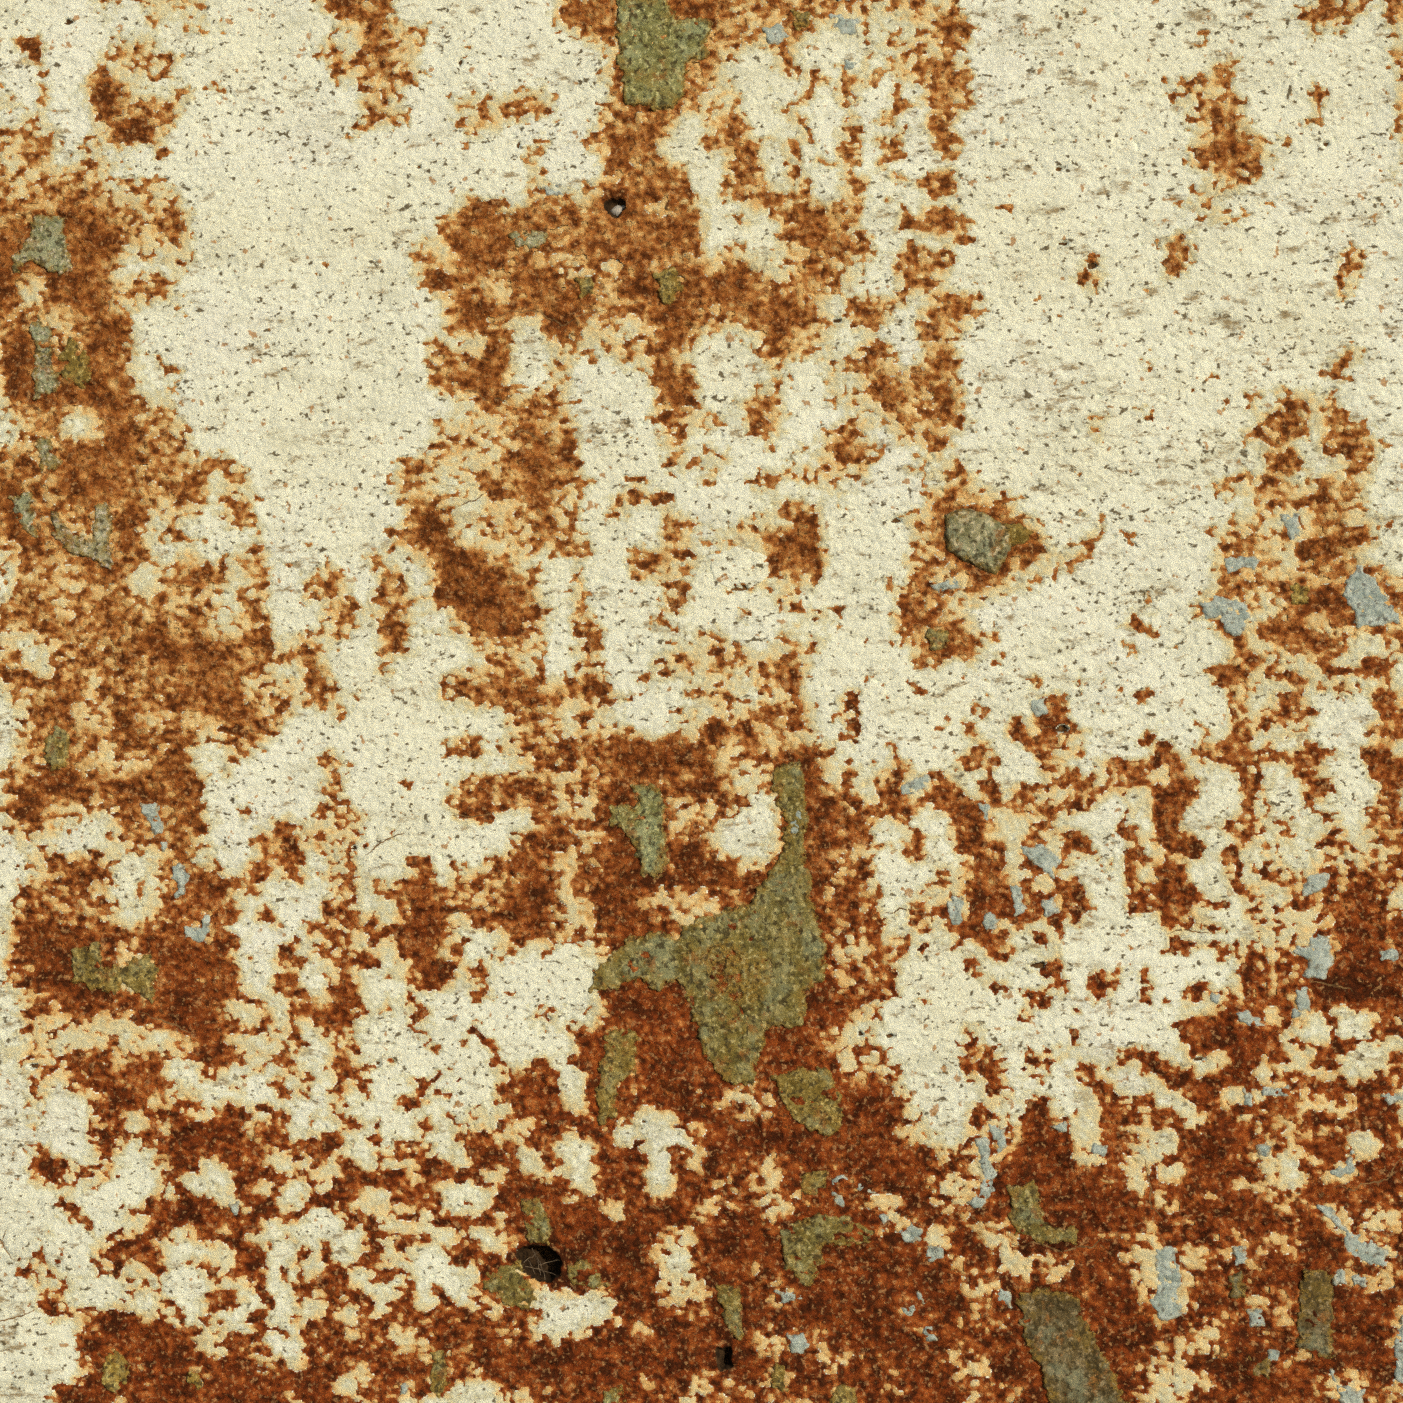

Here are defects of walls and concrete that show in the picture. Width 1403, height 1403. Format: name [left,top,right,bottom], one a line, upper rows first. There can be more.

peeling [12,29,56,112]
spalling [312,0,432,140]
peeling [445,81,560,150]
peeling [781,0,978,246]
spalling [1161,30,1330,226]
peeling [605,476,700,645]
spalling [701,498,845,631]
peeling [831,691,862,744]
peeling [963,957,1070,1022]
peeling [1086,964,1171,1006]
peeling [392,1067,453,1113]
peeling [955,1024,1015,1105]